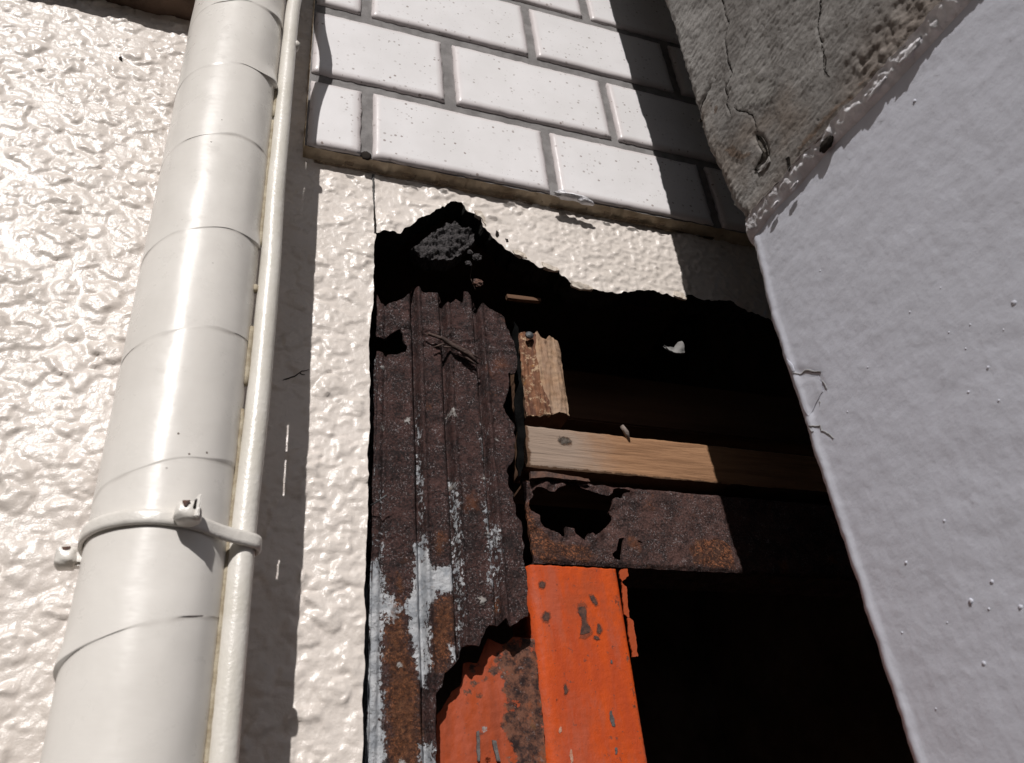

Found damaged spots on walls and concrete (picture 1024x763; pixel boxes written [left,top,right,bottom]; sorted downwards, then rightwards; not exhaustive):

crack [722,0,758,132]
crack [817,0,829,76]
spalling [374,201,778,337]
peeling [518,332,552,418]
peeling [787,360,823,416]
crack [791,369,833,438]
corrosion [529,471,590,484]
corrosion [577,594,603,640]
peeling [619,569,638,657]